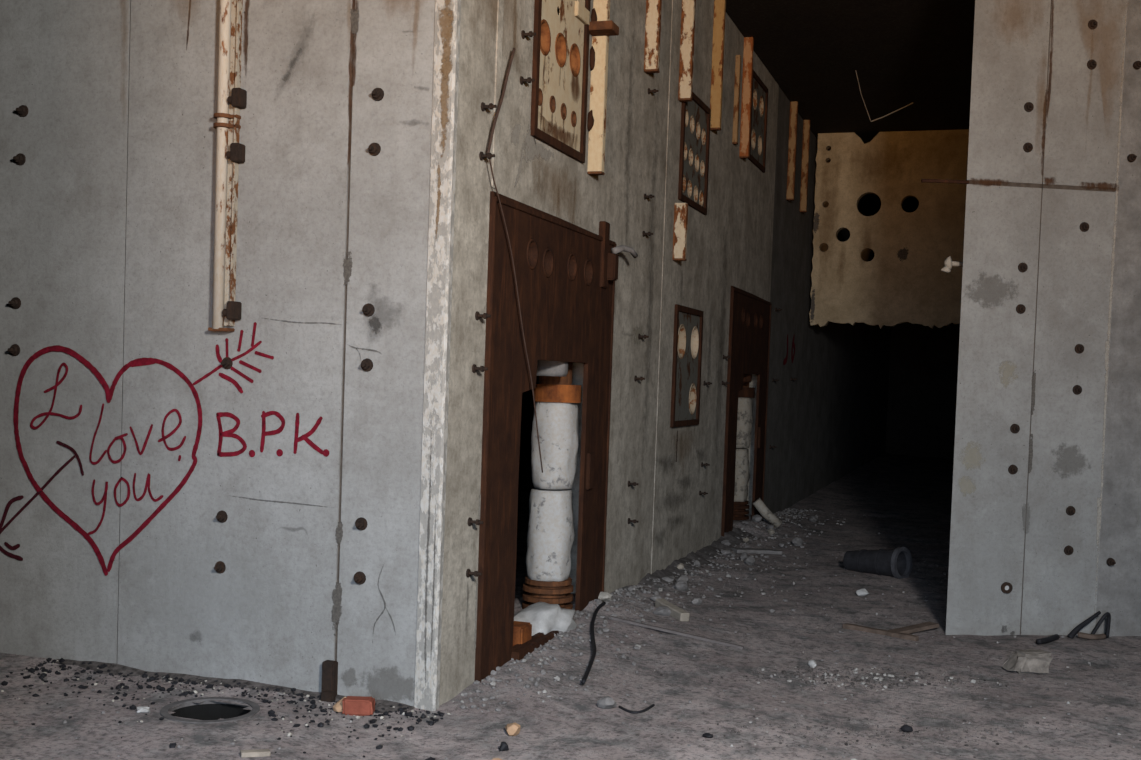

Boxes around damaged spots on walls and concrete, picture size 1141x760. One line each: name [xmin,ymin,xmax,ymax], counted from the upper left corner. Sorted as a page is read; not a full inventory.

peeling [436,0,453,234]
corrosion [1042,1,1053,164]
corrosion [1082,182,1116,190]